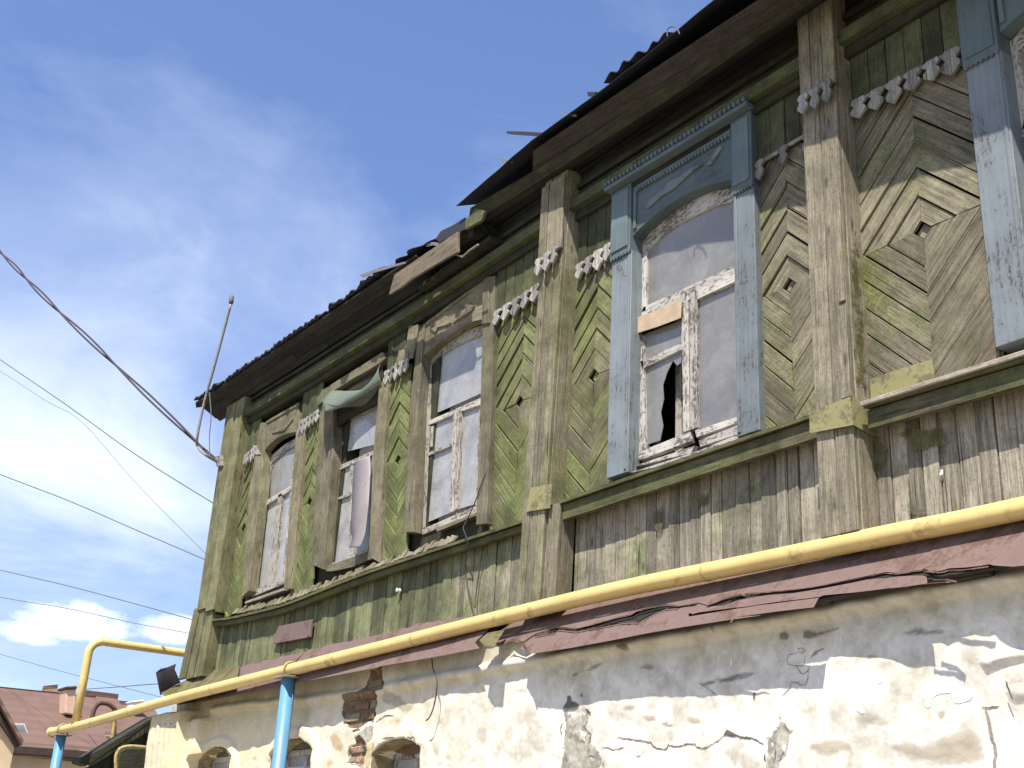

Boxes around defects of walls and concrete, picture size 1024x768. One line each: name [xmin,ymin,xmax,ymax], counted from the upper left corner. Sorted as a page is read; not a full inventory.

flaking render [342,667,384,768]
flaking render [560,694,604,768]
crack [603,730,764,750]
flaking render [764,716,793,768]